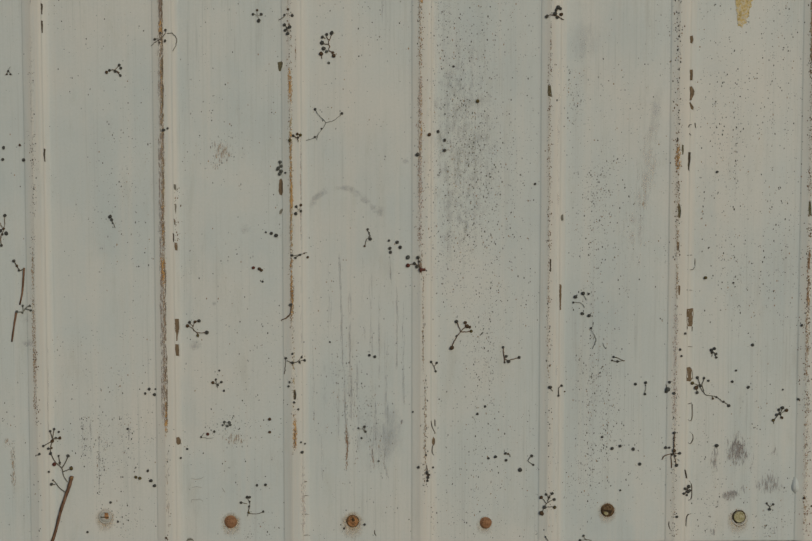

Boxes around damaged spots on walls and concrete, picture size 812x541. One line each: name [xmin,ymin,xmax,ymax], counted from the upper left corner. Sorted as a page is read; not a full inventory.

rust [157,0,181,436]
rust [286,3,296,328]